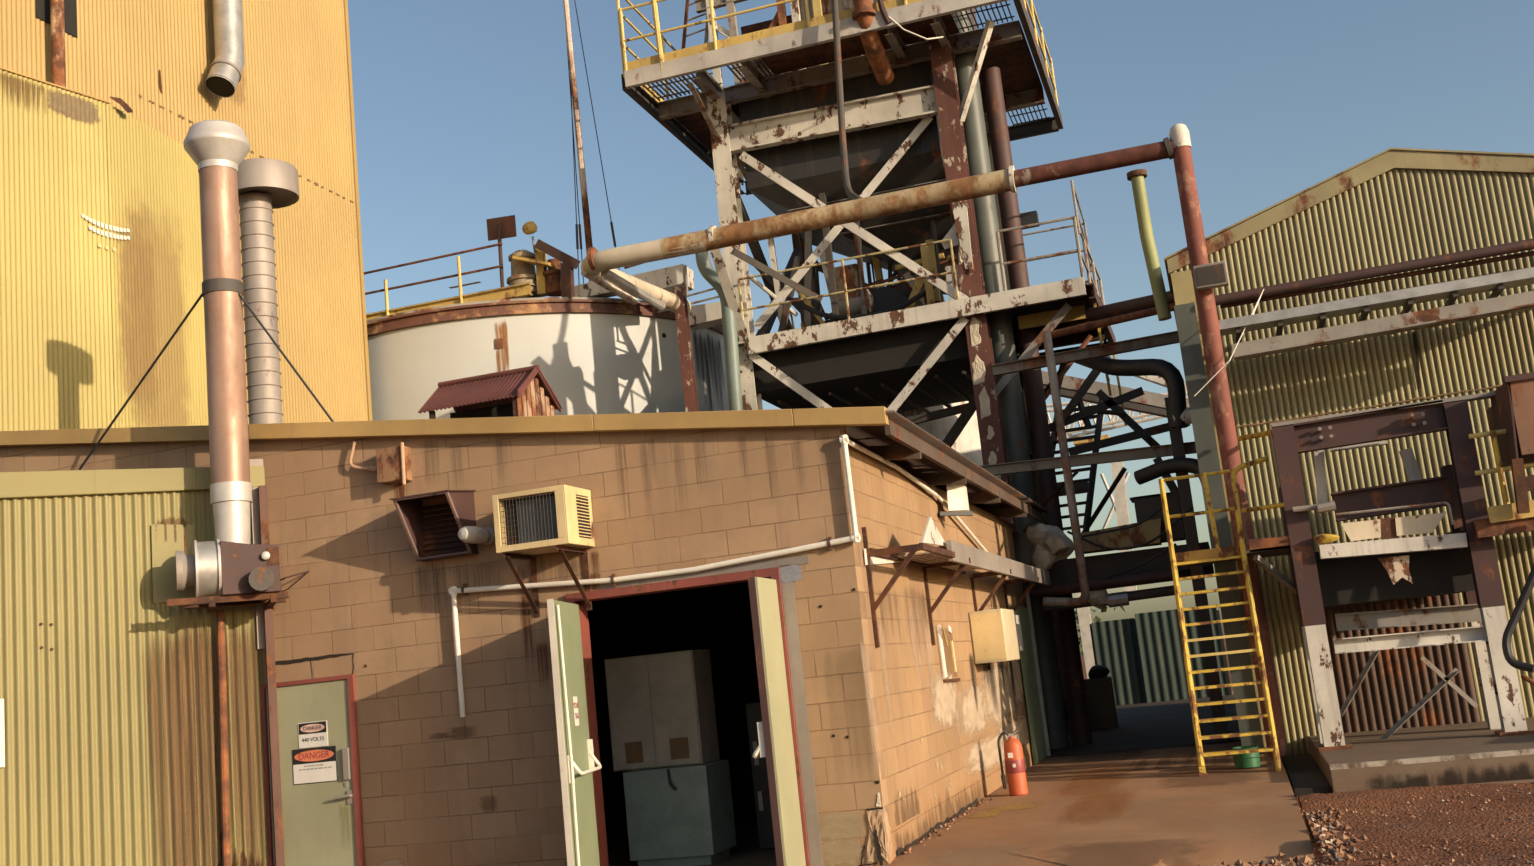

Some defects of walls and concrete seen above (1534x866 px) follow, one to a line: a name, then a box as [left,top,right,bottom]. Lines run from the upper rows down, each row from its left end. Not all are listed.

corrosion [218,831,263,866]